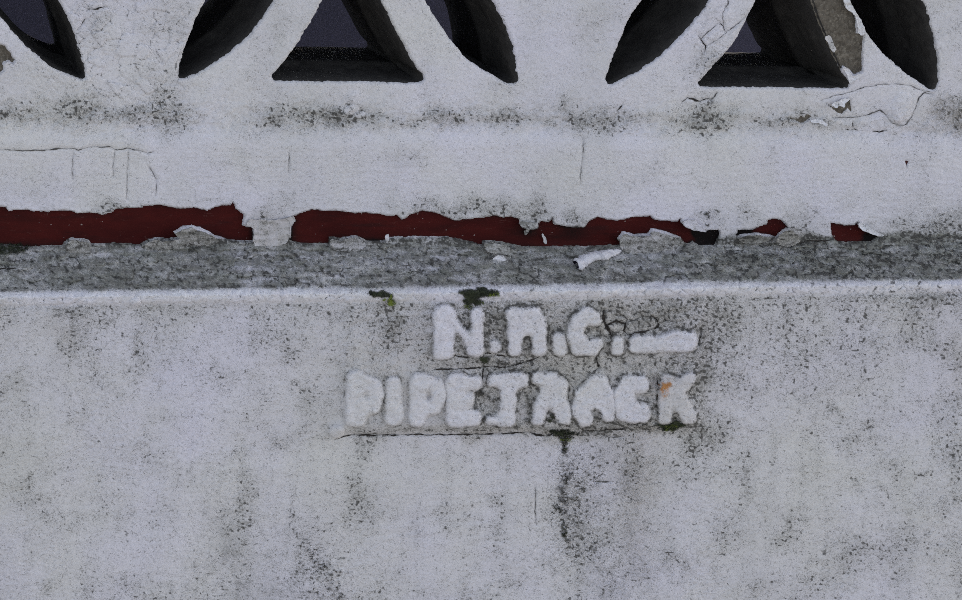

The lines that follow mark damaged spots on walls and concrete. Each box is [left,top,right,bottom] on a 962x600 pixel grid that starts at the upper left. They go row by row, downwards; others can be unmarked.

spalling [0,44,15,72]
spalling [790,114,827,126]
spalling [830,98,851,114]
peeling [0,203,719,261]
peeling [736,219,800,247]
peeling [831,222,884,242]
leakage [546,414,591,551]